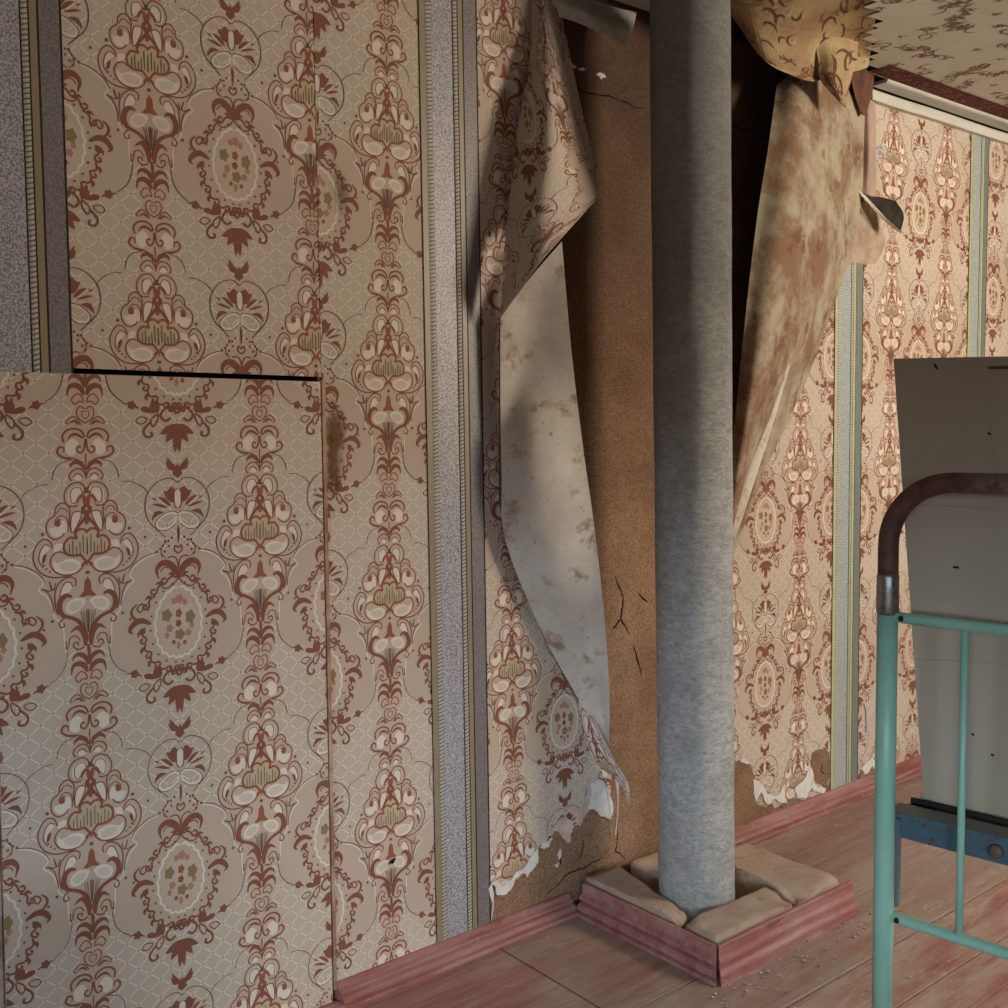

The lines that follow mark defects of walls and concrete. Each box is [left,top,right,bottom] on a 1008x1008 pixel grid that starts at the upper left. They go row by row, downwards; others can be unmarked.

peeling [731,72,783,444]
peeling [491,0,658,920]
crack [613,576,647,676]
peeling [734,749,831,827]